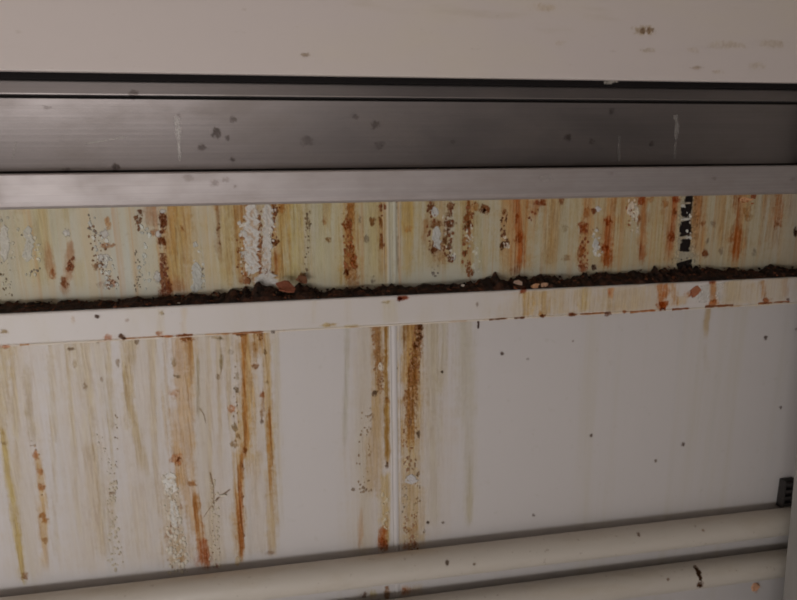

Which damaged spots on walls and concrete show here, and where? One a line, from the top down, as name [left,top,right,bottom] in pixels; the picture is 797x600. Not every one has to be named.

corrosion [154,209,172,296]
corrosion [342,218,357,276]
corrosion [426,201,490,277]
corrosion [500,212,510,250]
corrosion [677,196,708,270]
corrosion [402,324,423,550]